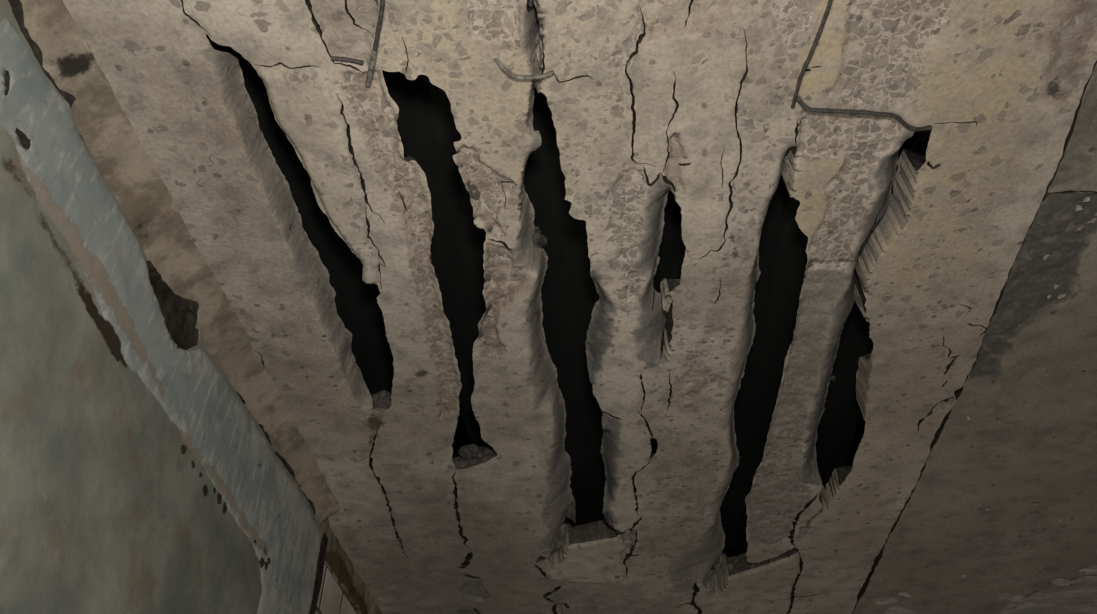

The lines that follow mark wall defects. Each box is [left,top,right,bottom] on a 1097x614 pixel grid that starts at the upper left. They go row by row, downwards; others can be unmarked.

crack [625,8,691,191]
crack [689,28,748,303]
peeling [0,18,320,614]
crack [361,418,409,560]
crack [452,472,481,579]
spalling [198,0,745,584]
crack [535,565,569,614]
crack [601,280,675,579]
crack [682,581,702,614]
crack [787,494,818,614]
spalling [665,0,957,614]
crack [917,304,987,431]